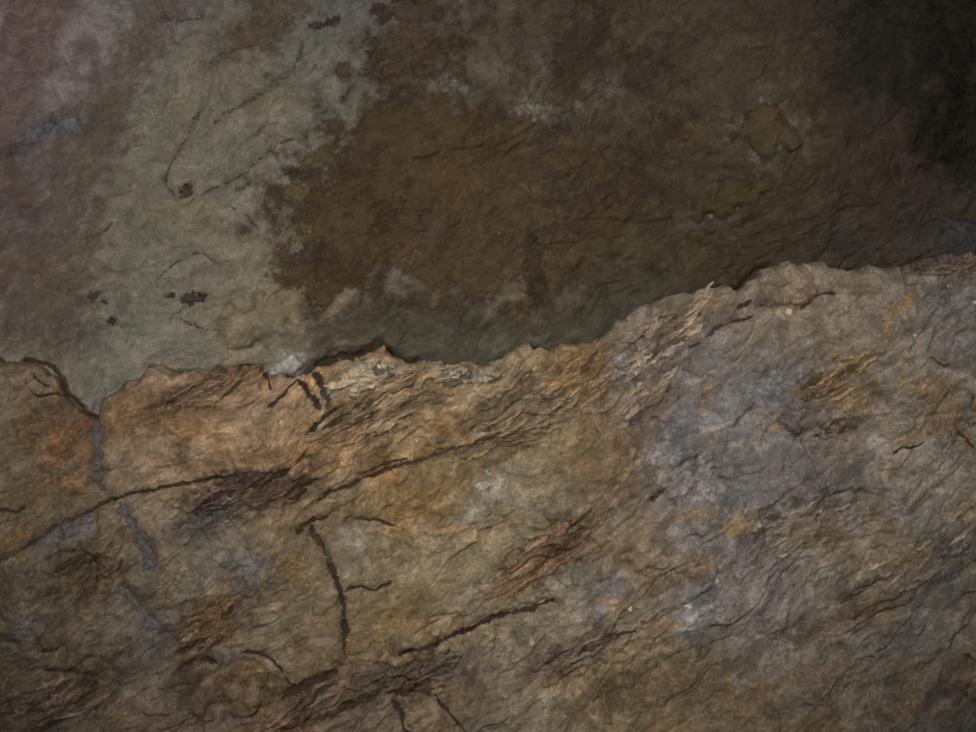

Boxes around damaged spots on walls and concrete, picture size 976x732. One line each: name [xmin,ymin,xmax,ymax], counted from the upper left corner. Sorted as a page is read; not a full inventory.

peeling [164,291,207,307]
spalling [144,364,267,415]
crack [231,343,410,435]
spalling [317,350,506,449]
spalling [455,281,717,460]
spalling [798,348,880,403]
crack [0,356,289,572]
crack [240,440,499,699]
crack [41,647,93,676]
crack [120,584,217,677]
crack [280,689,467,732]